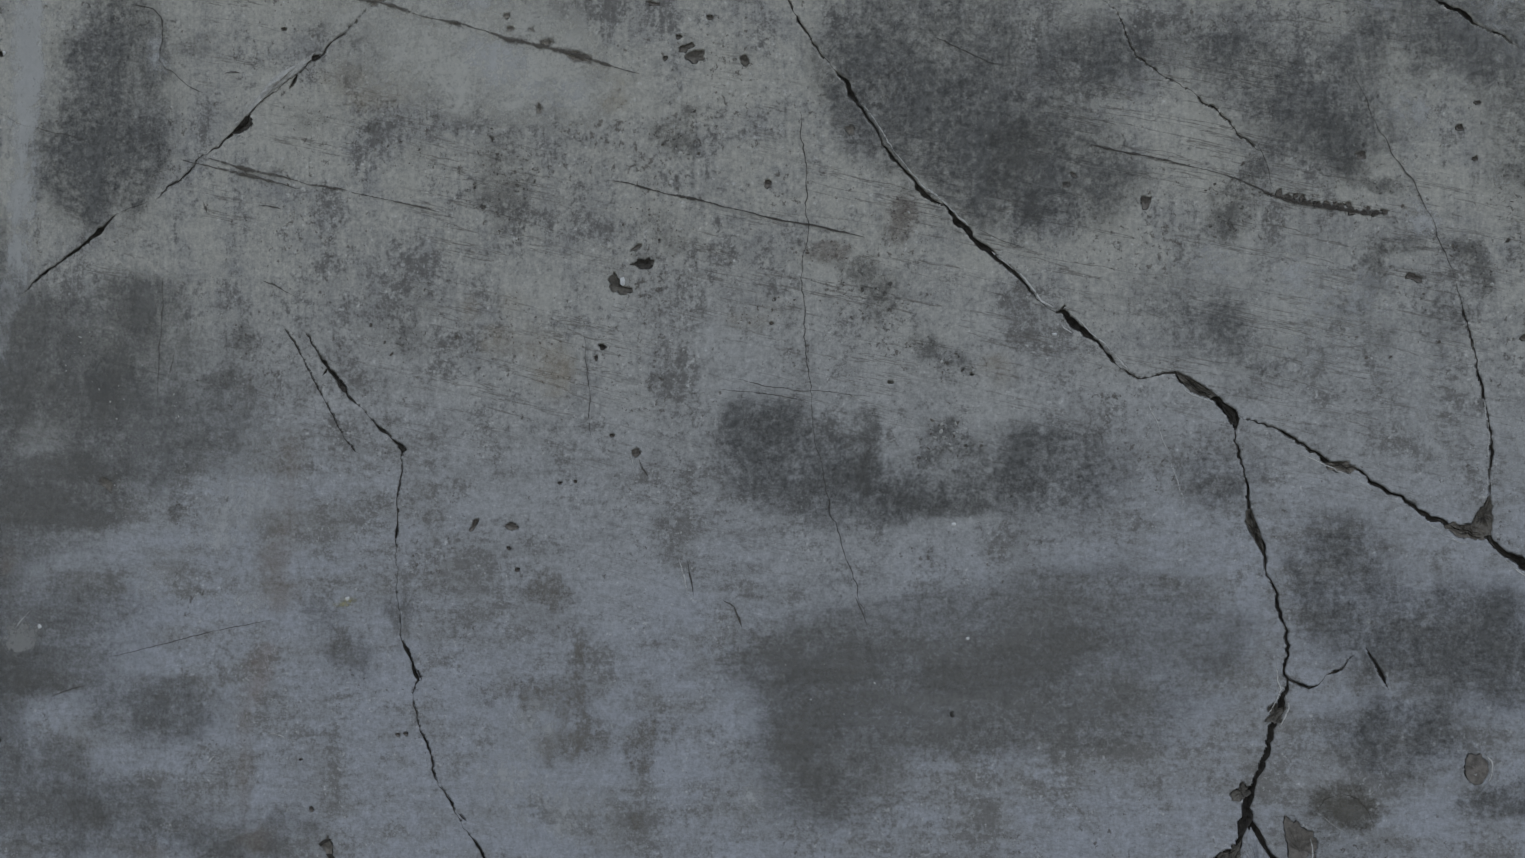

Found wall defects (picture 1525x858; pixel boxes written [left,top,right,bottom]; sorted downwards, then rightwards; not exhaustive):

crack [22,0,383,294]
crack [285,329,485,858]
crack [723,115,870,609]
crack [788,0,1525,858]